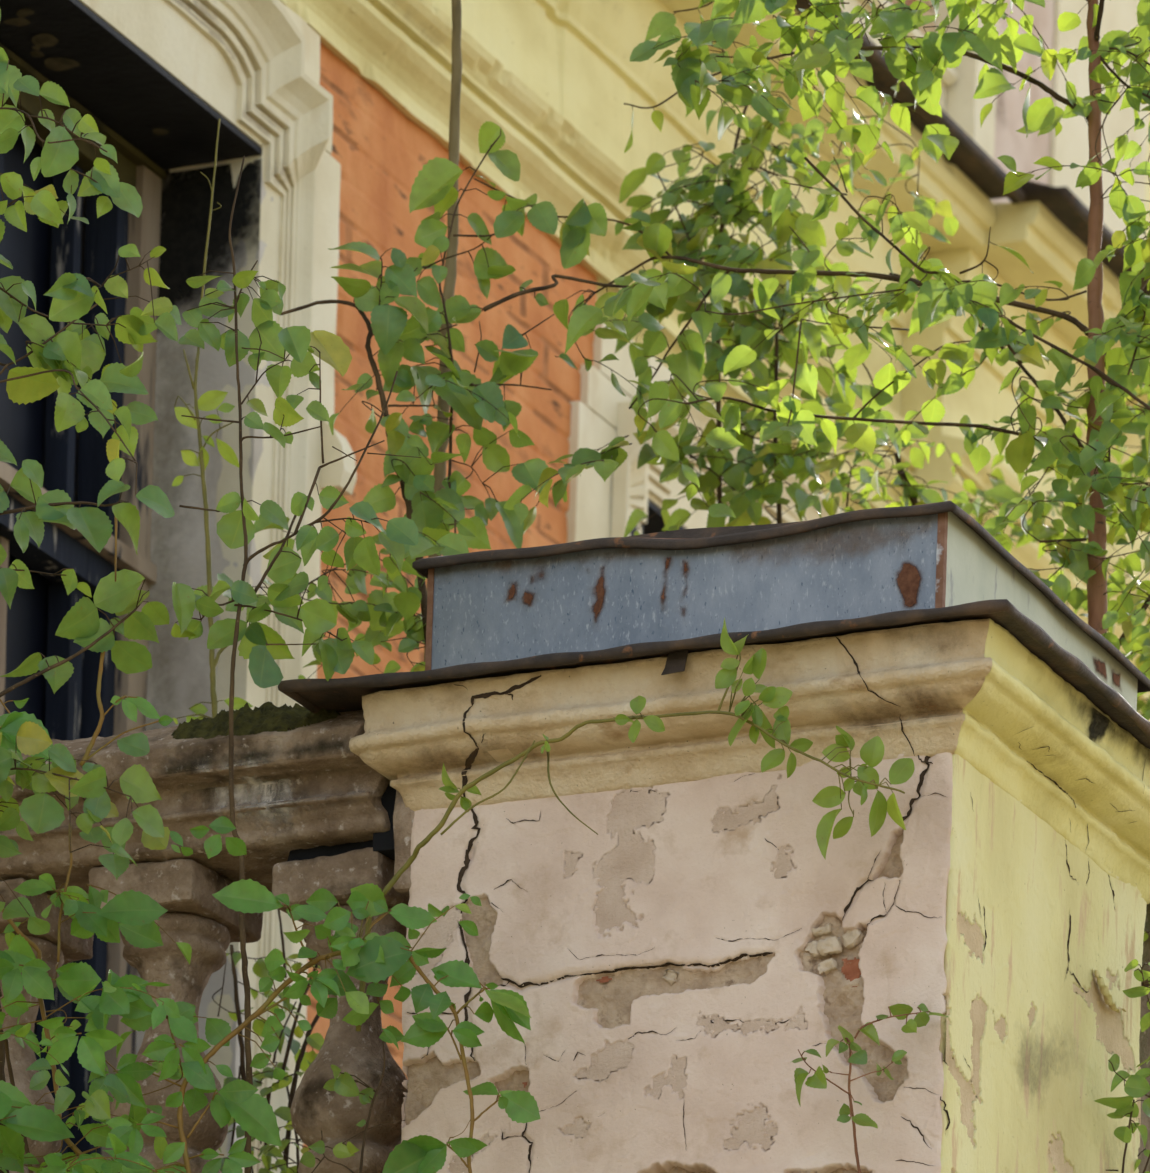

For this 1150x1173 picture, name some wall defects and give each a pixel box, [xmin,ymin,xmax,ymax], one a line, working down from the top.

corrosion [507,573,543,606]
corrosion [593,567,605,621]
corrosion [896,562,921,607]
crack [835,636,974,821]
crack [407,670,543,1061]
crack [842,854,939,933]
flaking render [878,833,904,879]
crack [501,929,800,988]
flaking render [576,955,775,1082]
flaking render [799,915,909,1102]
peeling [946,995,1006,1148]
peeling [1071,968,1141,1073]